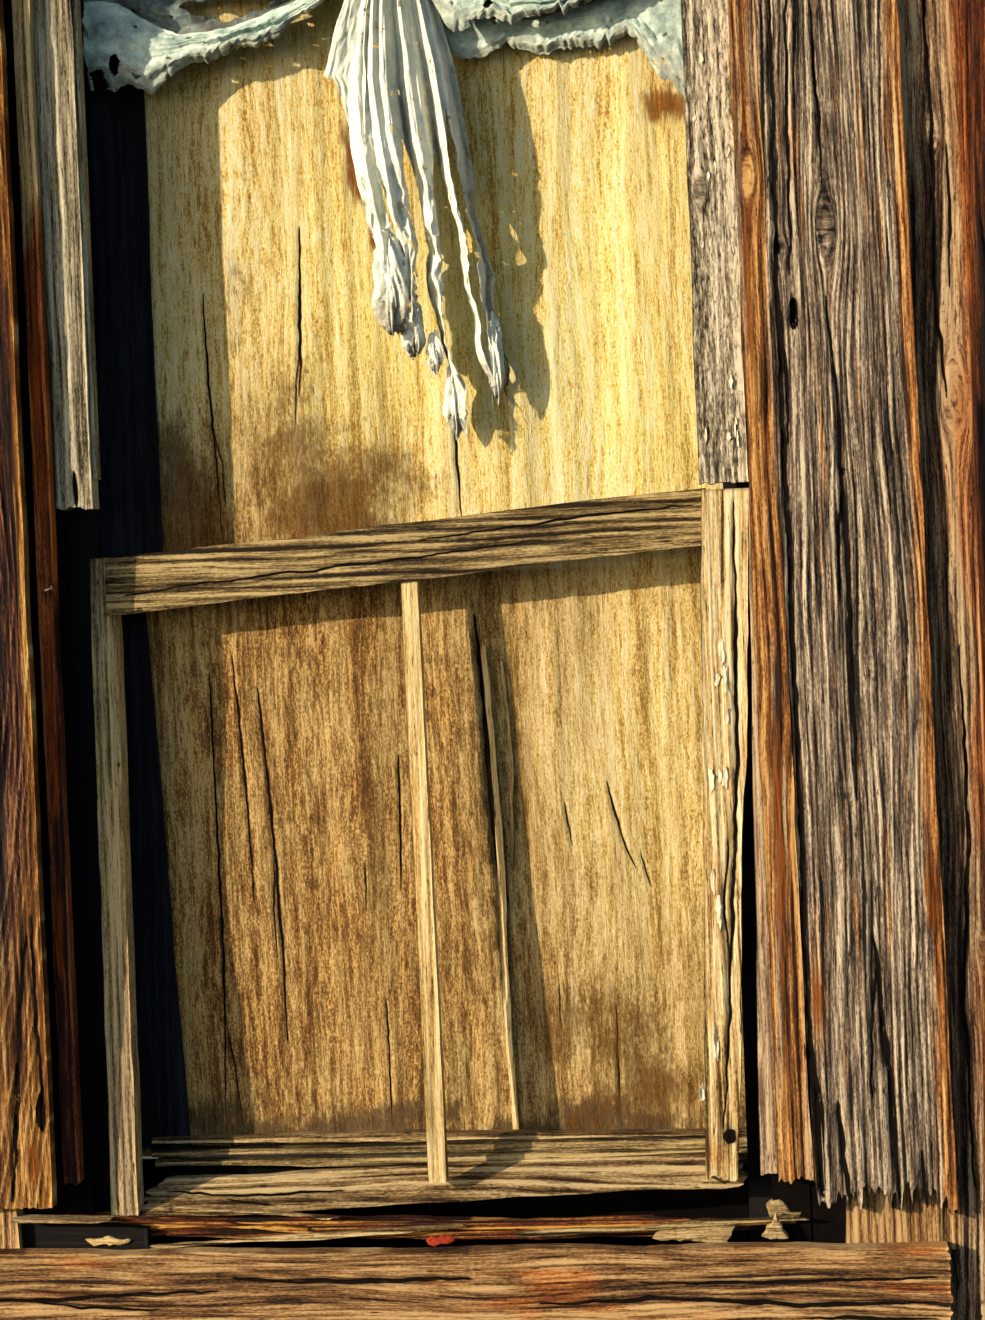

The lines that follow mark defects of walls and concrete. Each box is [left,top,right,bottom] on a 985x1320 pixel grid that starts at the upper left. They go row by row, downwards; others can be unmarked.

crack [202,295,226,532]
crack [294,228,302,425]
water stain [241,370,437,539]
crack [208,658,288,1119]
crack [564,802,572,844]
crack [606,780,651,885]